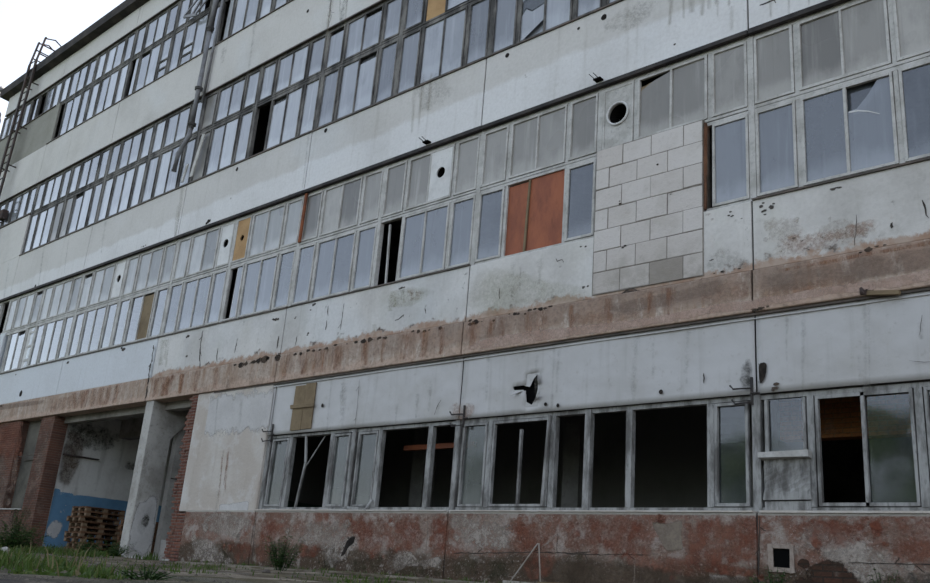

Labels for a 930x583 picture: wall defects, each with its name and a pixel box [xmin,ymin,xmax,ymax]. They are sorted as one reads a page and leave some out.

spalling [234,353,280,368]
spalling [758,362,779,391]
leakage [60,425,113,483]
peeling [219,501,248,510]
spalling [299,518,381,563]
spalling [387,513,641,576]
spalling [780,519,915,583]